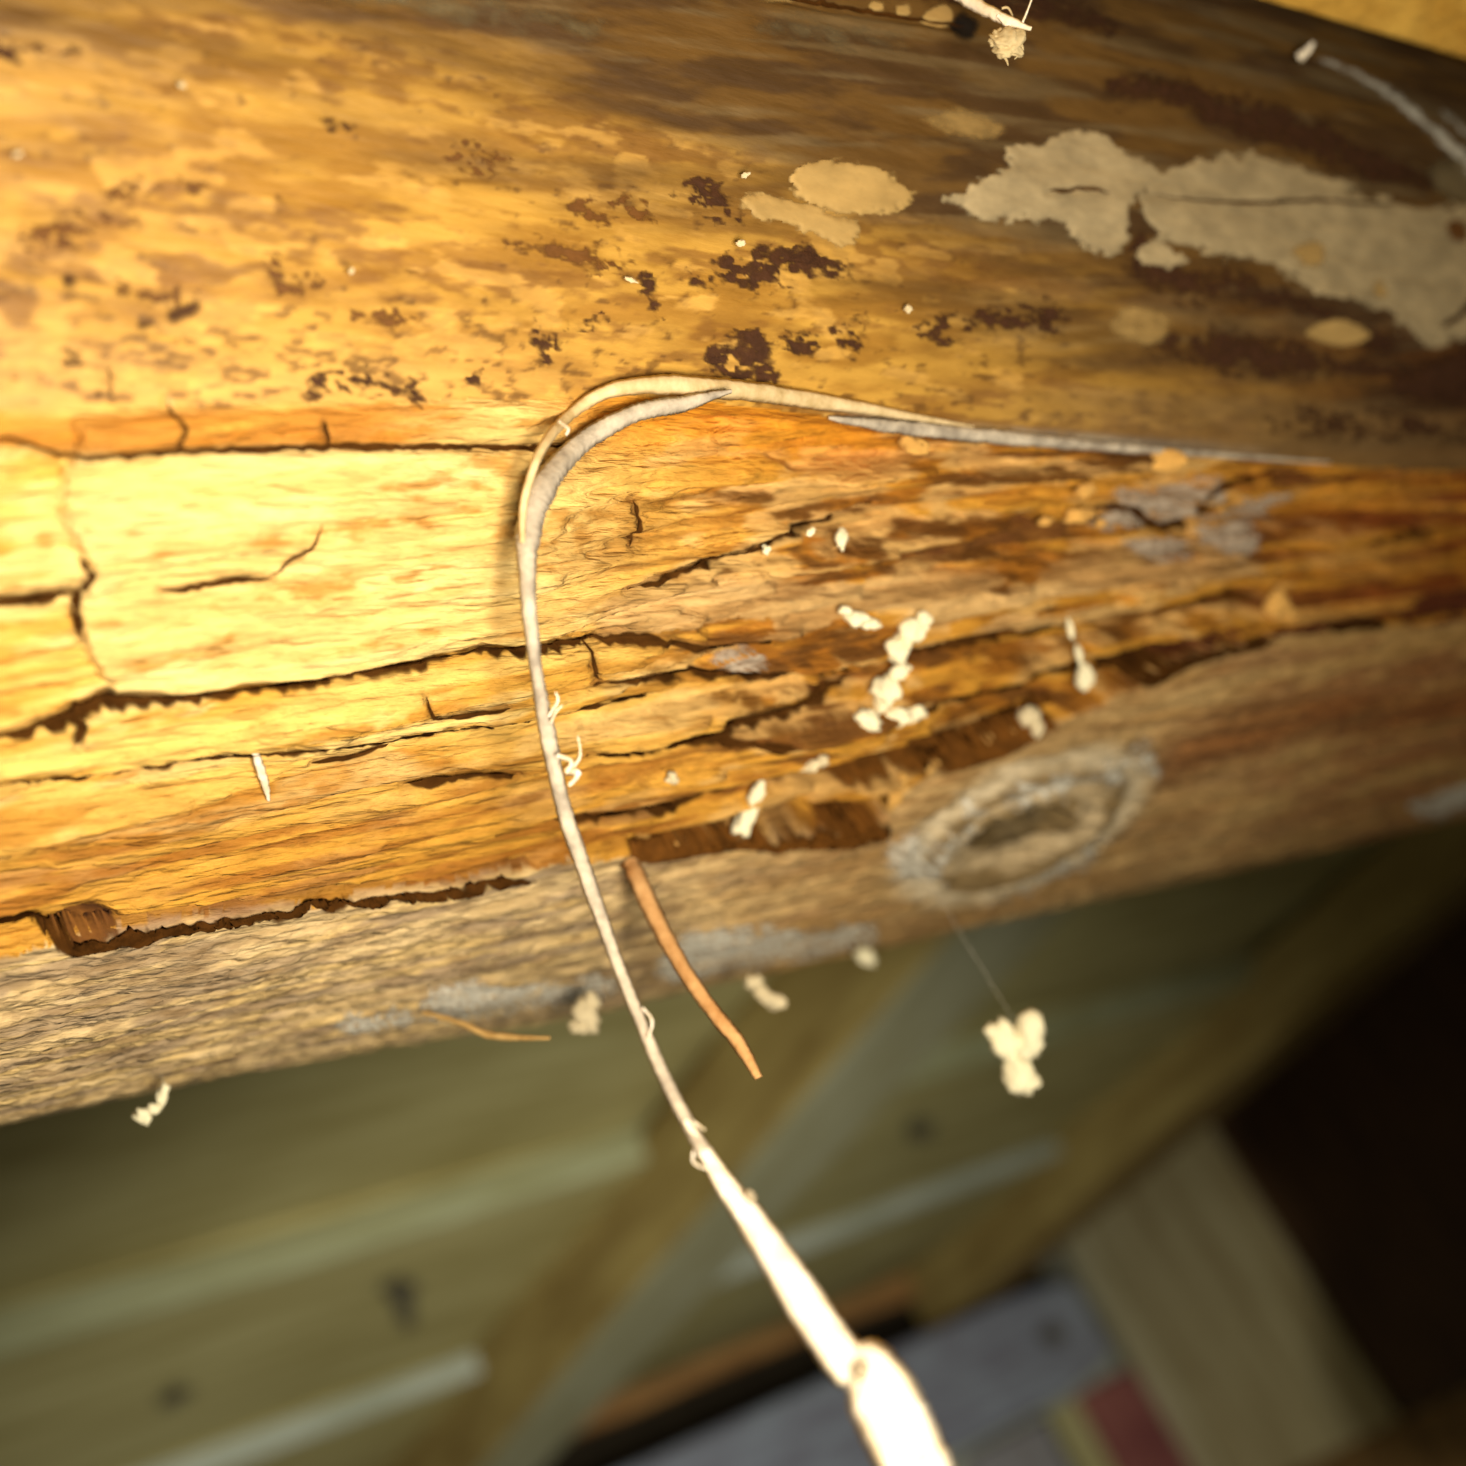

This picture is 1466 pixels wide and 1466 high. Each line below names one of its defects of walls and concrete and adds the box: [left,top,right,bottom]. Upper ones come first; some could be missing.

crack [0,401,562,463]
crack [0,558,96,641]
crack [161,527,322,593]
crack [626,501,873,590]
crack [1180,590,1260,605]
crack [0,625,1280,869]
crack [0,874,536,958]